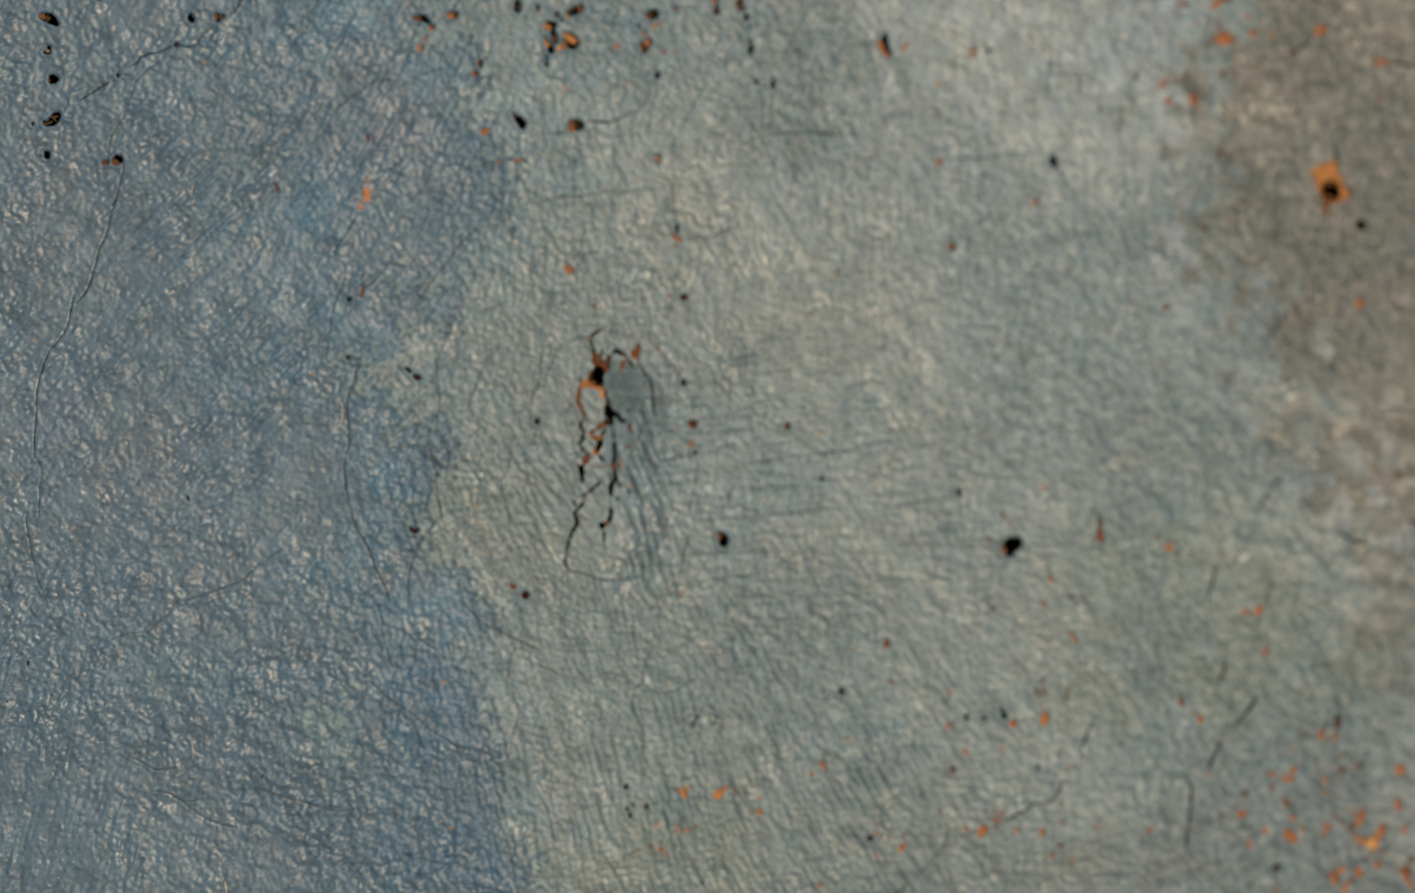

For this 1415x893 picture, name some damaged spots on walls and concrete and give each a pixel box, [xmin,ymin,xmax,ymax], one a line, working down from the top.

crack [26,0,242,610]
crack [326,214,549,811]
crack [461,591,717,757]
crack [499,86,855,589]